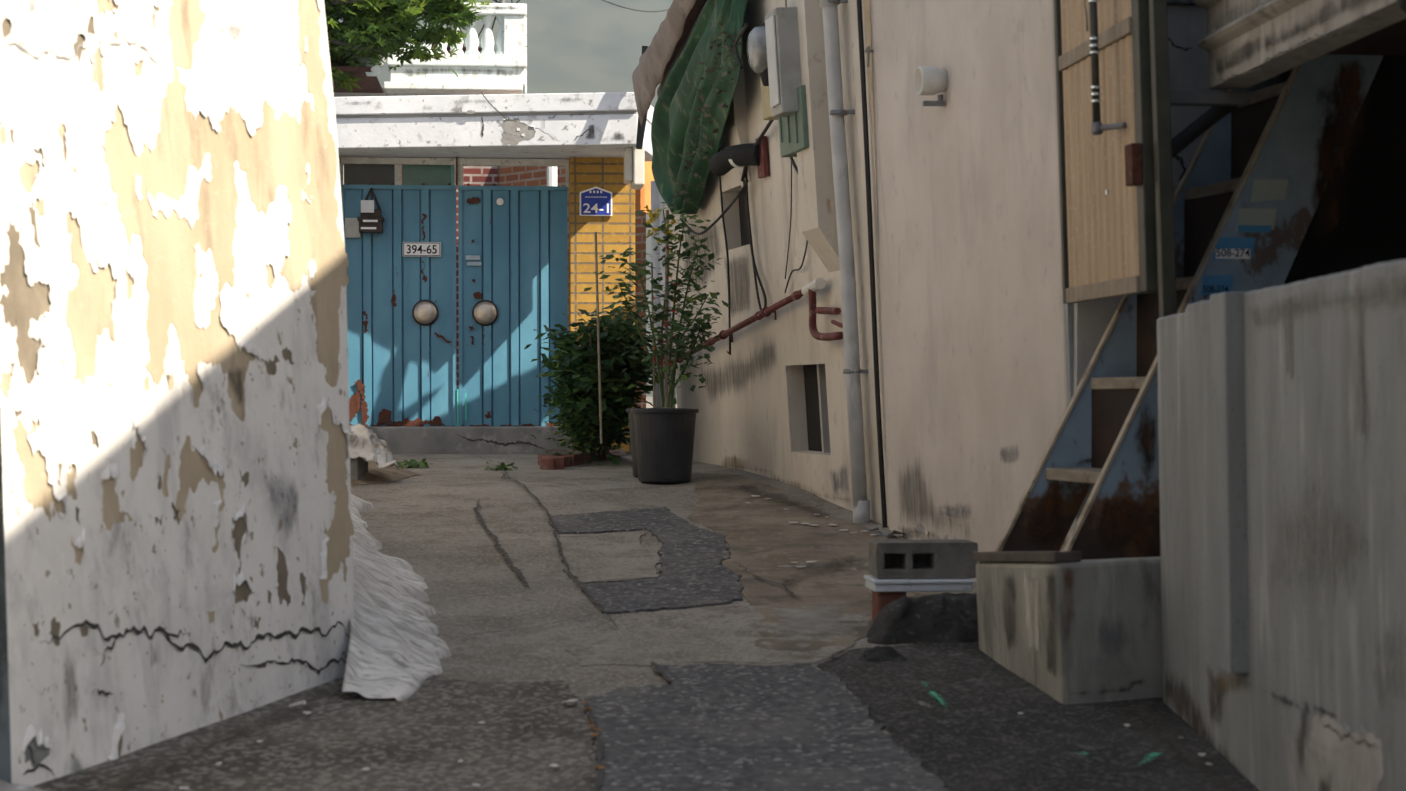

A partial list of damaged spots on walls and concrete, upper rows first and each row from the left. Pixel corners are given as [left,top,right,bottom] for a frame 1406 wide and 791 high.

crack [0,37,171,64]
rust [1313,62,1364,236]
peeling [0,0,354,630]
rust [349,379,564,427]
peeling [33,617,61,646]
crack [40,620,350,696]
water stain [1004,571,1072,674]
flaking render [22,724,55,777]
flaking render [106,705,125,761]
peeling [1308,713,1384,791]